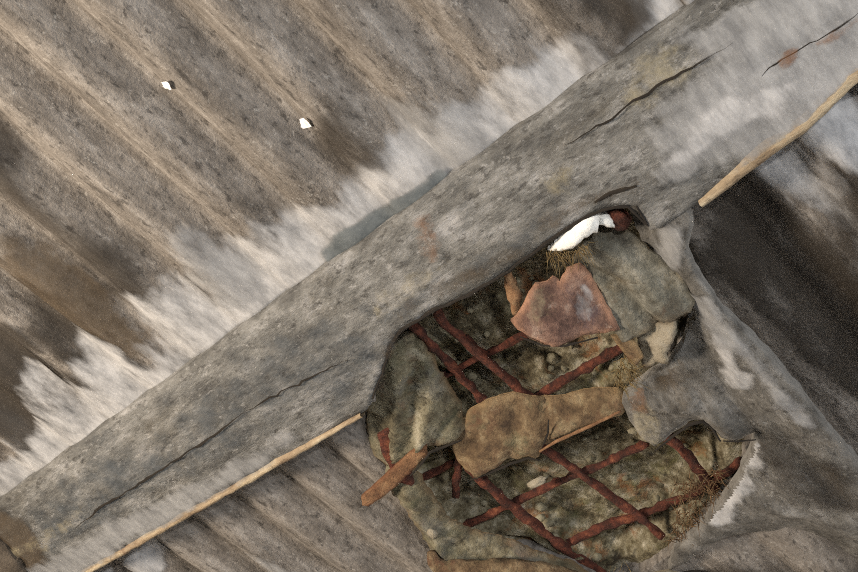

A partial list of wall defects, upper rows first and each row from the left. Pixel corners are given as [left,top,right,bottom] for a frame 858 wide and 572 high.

damp [584,0,694,53]
crack [565,44,731,145]
crack [764,13,858,73]
damp [657,0,858,397]
damp [0,33,607,496]
spalling [418,208,695,416]
damp [693,297,811,426]
damp [0,457,265,572]
spalling [414,411,744,572]
damp [710,445,858,525]